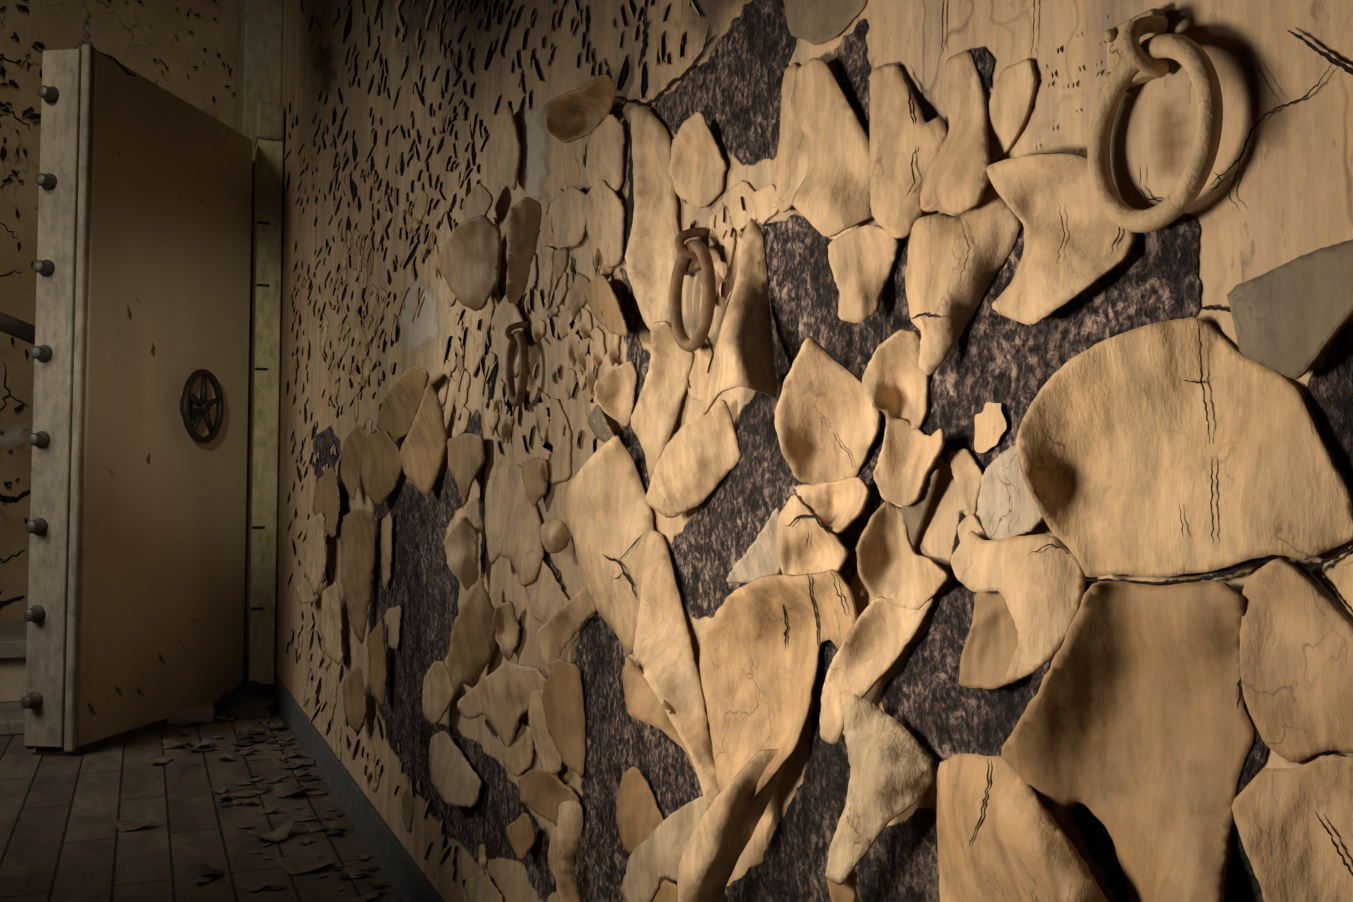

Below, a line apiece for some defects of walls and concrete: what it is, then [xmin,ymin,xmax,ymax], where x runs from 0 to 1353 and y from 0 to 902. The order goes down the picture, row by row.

crack [0,53,38,67]
crack [0,111,32,132]
crack [1210,29,1353,211]
crack [1137,167,1163,202]
crack [0,363,29,441]
peeling [283,0,1353,902]
crack [0,489,31,503]
crack [0,550,25,609]